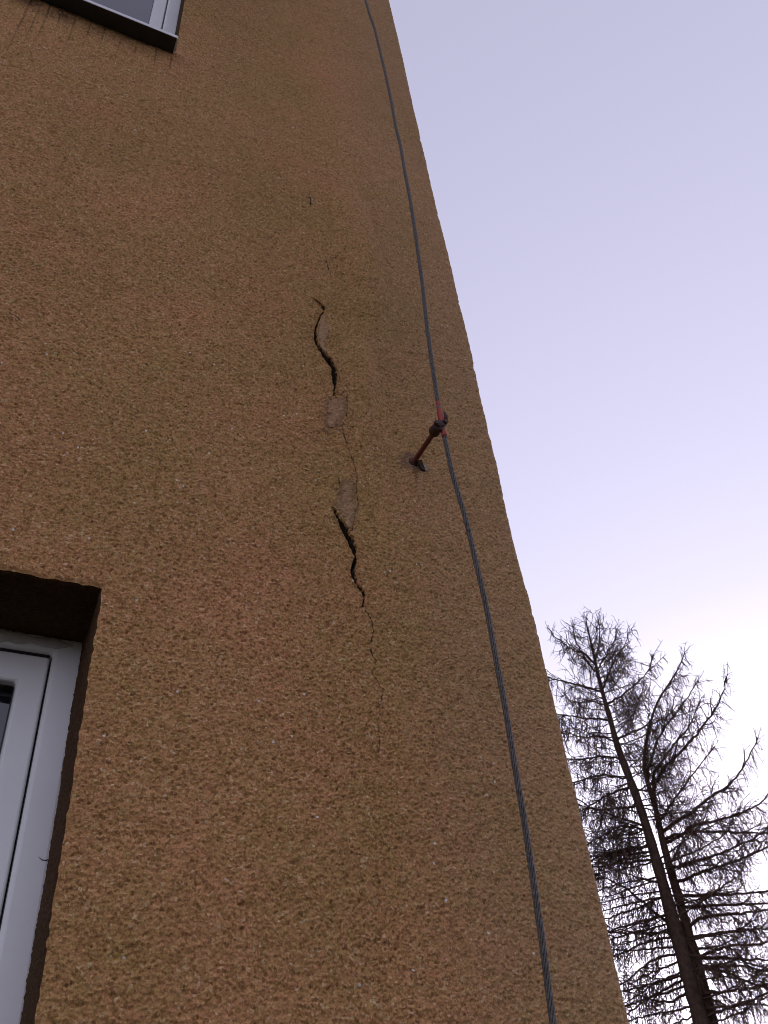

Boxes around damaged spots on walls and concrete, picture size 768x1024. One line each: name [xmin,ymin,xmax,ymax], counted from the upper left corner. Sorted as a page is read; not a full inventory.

crack [311,297,383,750]